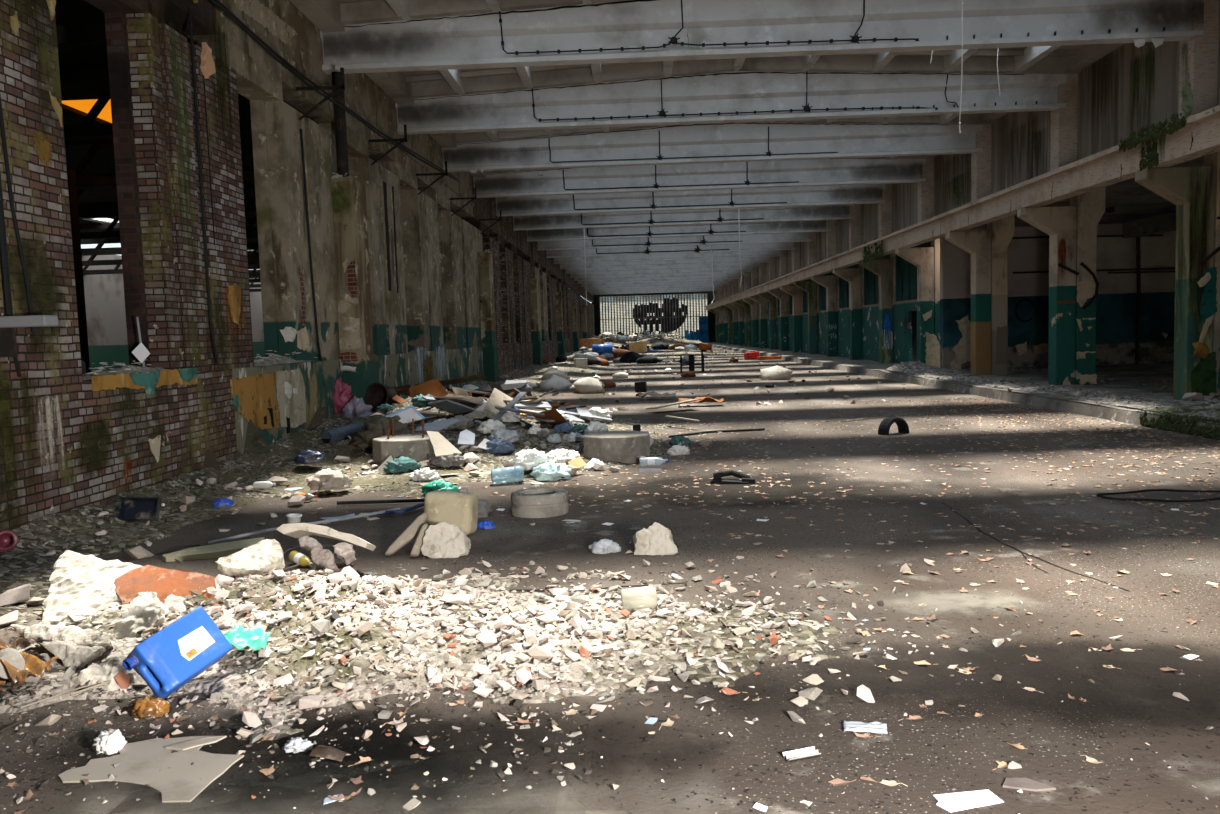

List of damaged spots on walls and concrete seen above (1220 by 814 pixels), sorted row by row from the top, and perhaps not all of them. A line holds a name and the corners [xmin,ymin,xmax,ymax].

peeling [200,42,216,79]
peeling [84,360,197,395]
peeling [230,267,319,434]
peeling [1063,374,1097,385]
peeling [1076,279,1098,360]
peeling [1190,267,1220,396]